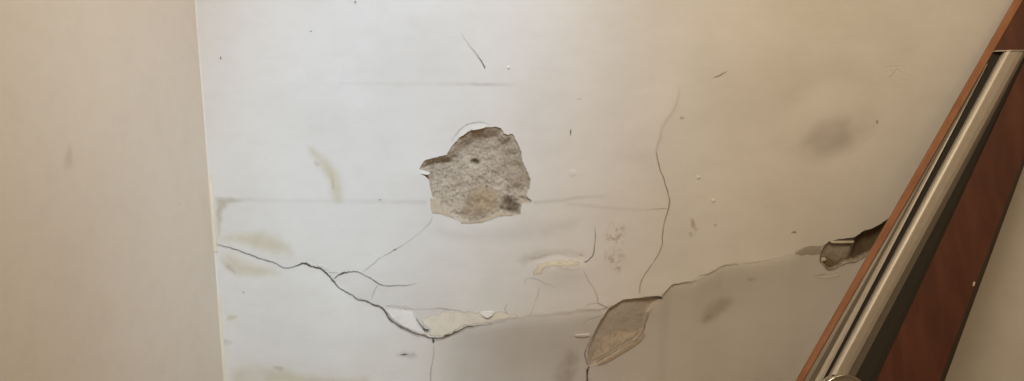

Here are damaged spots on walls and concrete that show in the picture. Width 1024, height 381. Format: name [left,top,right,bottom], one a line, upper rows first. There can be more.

spalling [420,126,532,223]
spalling [796,219,888,279]
crack [230,247,428,337]
peeling [387,308,517,343]
spalling [575,296,662,381]